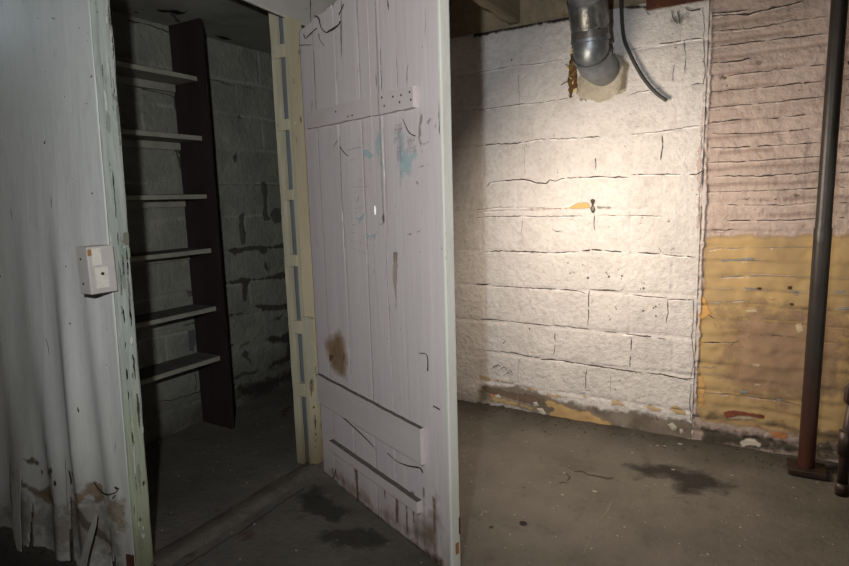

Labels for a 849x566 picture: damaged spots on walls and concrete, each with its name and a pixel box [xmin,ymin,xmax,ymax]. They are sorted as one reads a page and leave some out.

peeling [695,235,813,438]
peeling [817,235,849,443]
spalling [478,375,692,439]
damp [21,470,54,505]
damp [75,482,103,511]
damp [635,465,718,492]